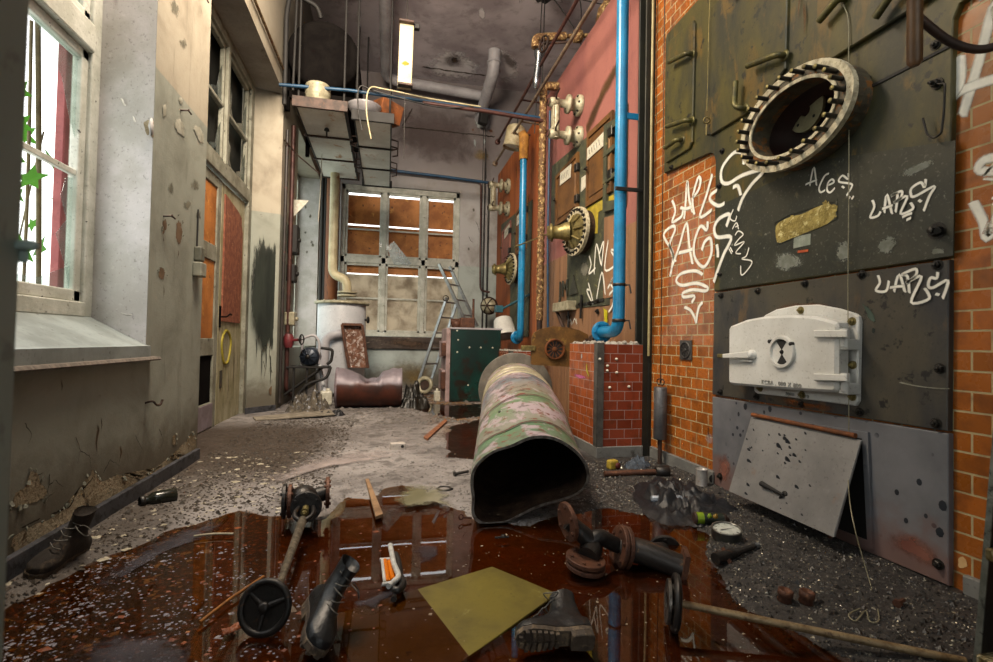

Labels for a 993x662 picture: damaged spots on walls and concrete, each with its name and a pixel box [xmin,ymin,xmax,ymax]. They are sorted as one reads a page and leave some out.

flaking render [8,433,197,552]